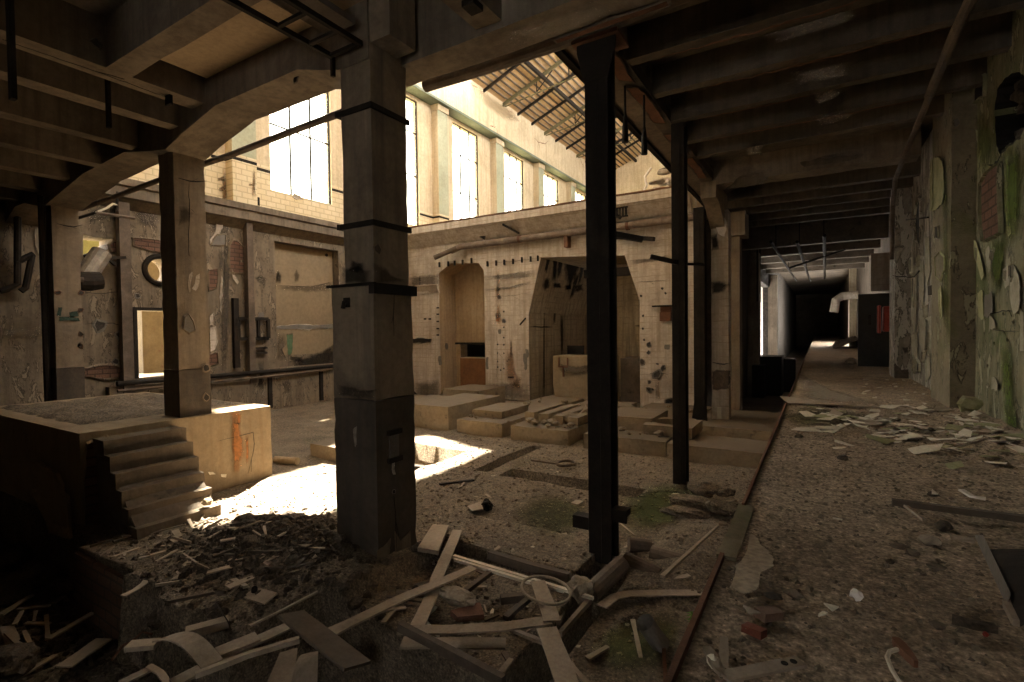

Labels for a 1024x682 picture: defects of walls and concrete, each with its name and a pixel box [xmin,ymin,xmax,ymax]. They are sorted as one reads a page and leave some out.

spalling [210,224,228,247]
flaking render [188,268,239,373]
peeling [791,157,1024,469]